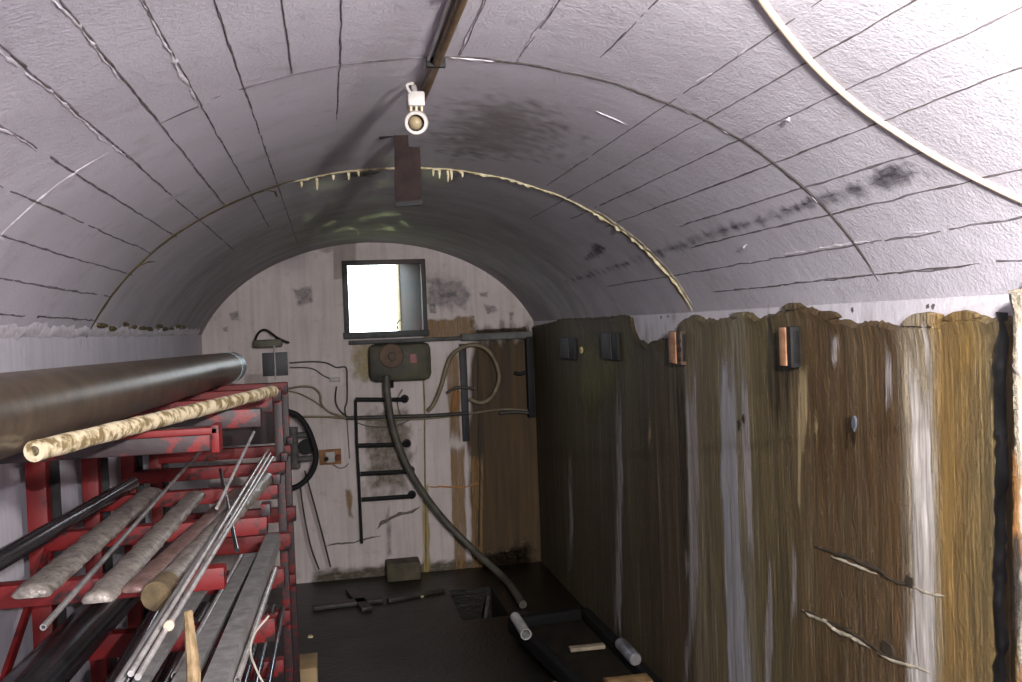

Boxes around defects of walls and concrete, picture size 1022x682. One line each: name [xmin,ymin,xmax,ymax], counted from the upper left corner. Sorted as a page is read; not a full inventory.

water stain [294,167,395,190]
crack [0,0,1022,338]
water stain [421,167,1022,682]
water stain [315,567,386,582]
crack [814,546,945,597]
crack [800,609,931,674]